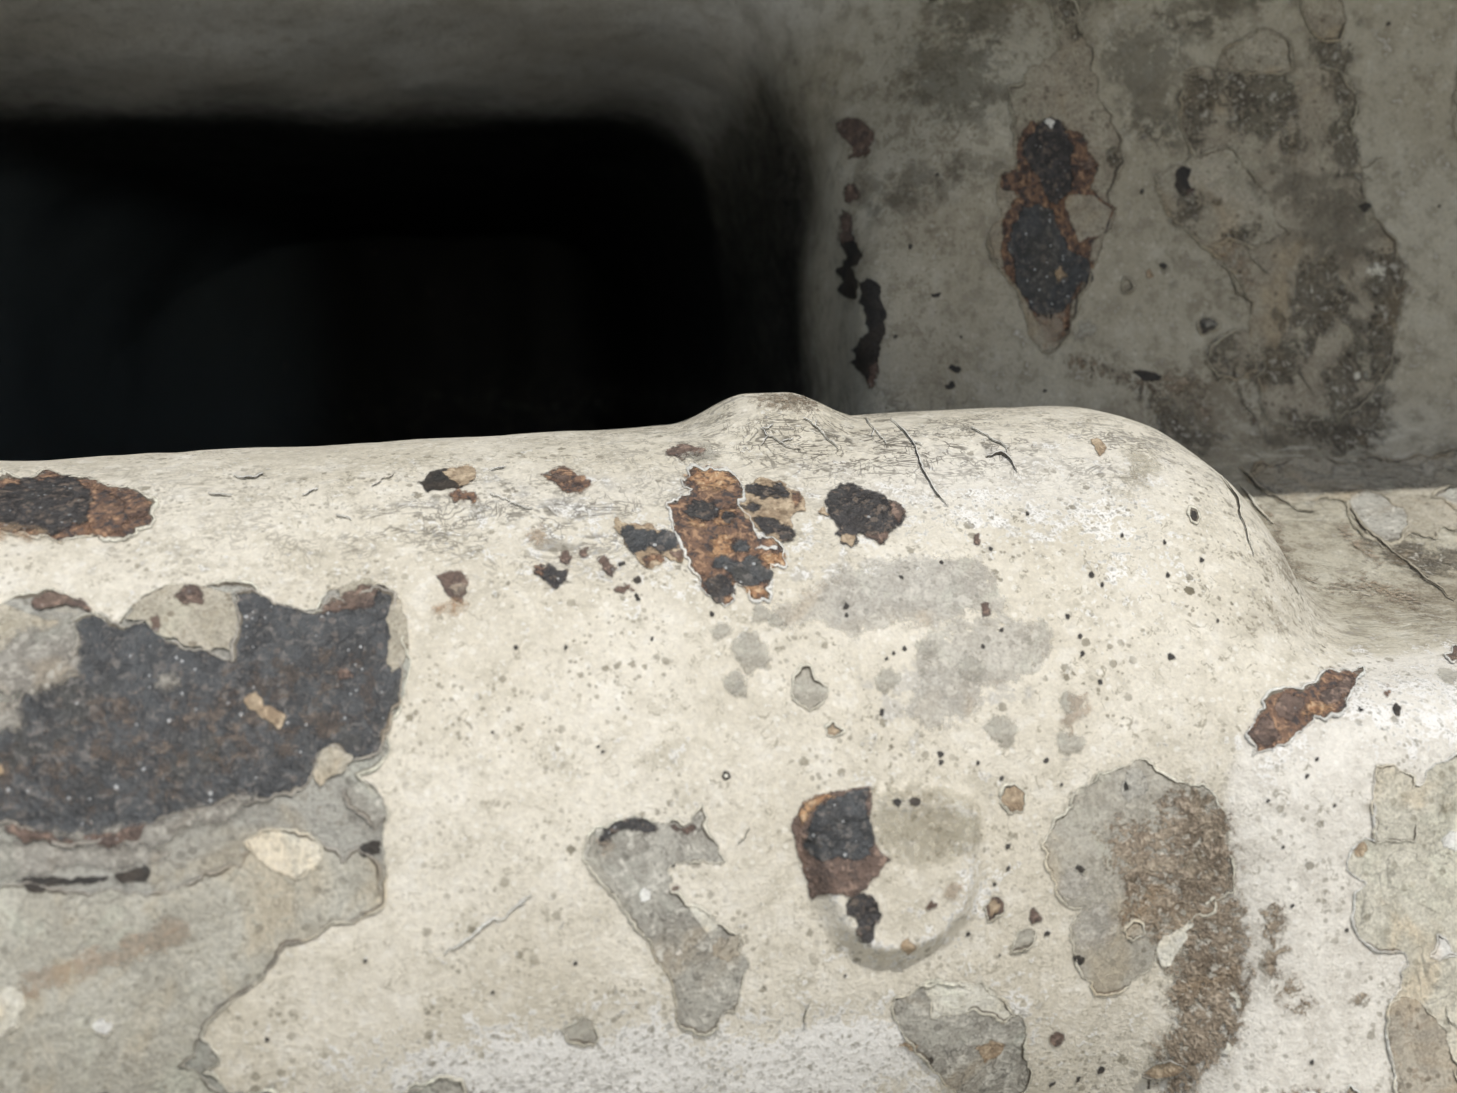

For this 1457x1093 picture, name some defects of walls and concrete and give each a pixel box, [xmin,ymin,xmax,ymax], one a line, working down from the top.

rust [986,0,1126,354]
peeling [1140,0,1457,549]
rust [0,467,159,544]
rust [534,444,906,607]
crack [1221,466,1315,555]
crack [1349,503,1455,599]
crack [1434,448,1457,496]
rust [1245,666,1366,757]
peeling [0,578,411,1093]
peeling [582,803,750,1037]
peeling [1345,752,1457,1093]
peeling [891,978,1033,1093]